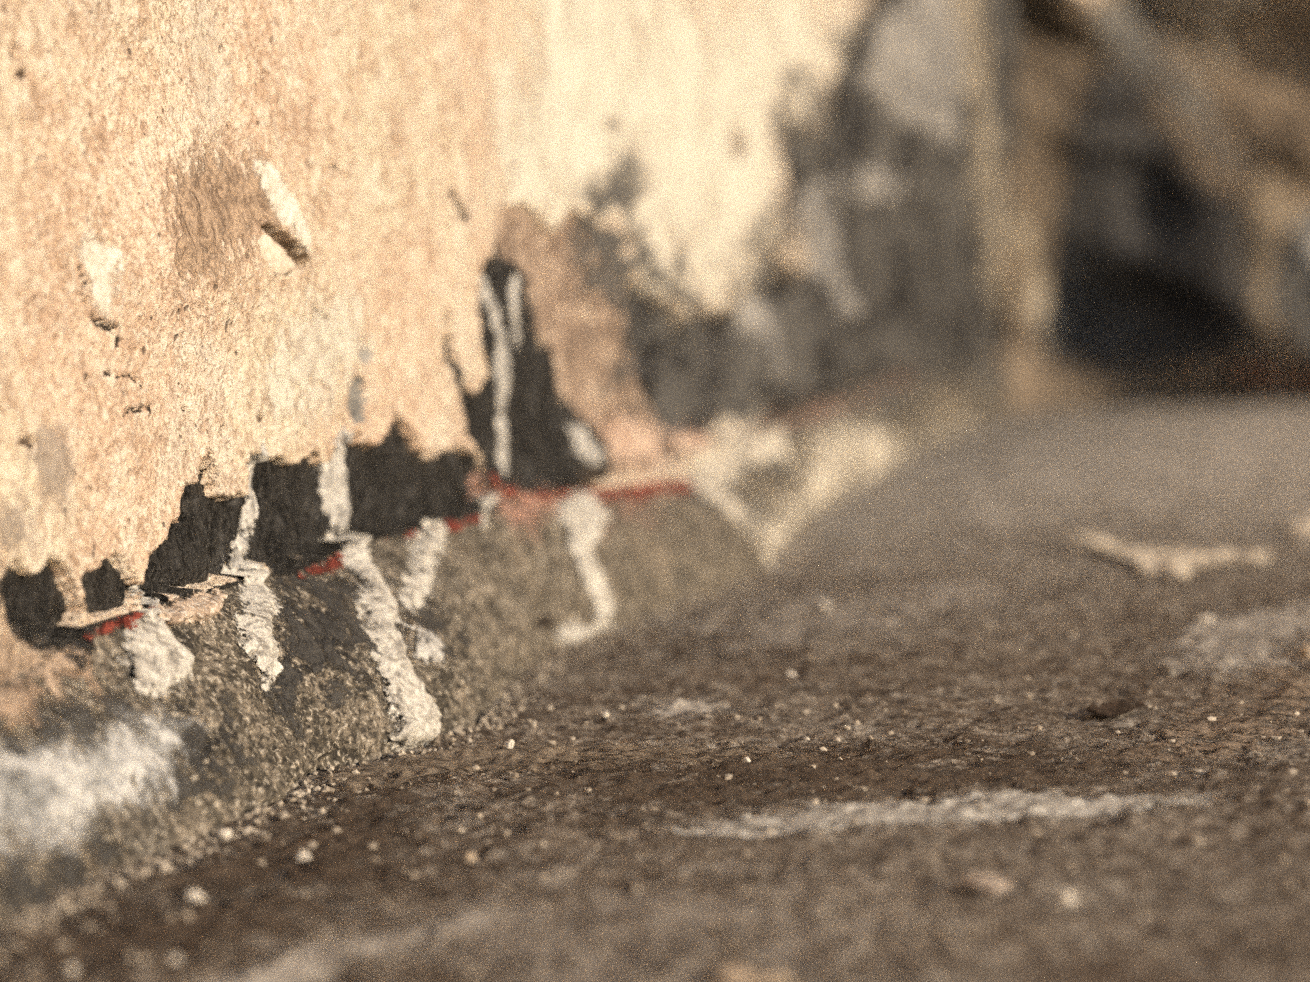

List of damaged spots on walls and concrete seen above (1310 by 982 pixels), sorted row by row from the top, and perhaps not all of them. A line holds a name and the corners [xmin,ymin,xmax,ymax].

spalling [0,0,1021,720]